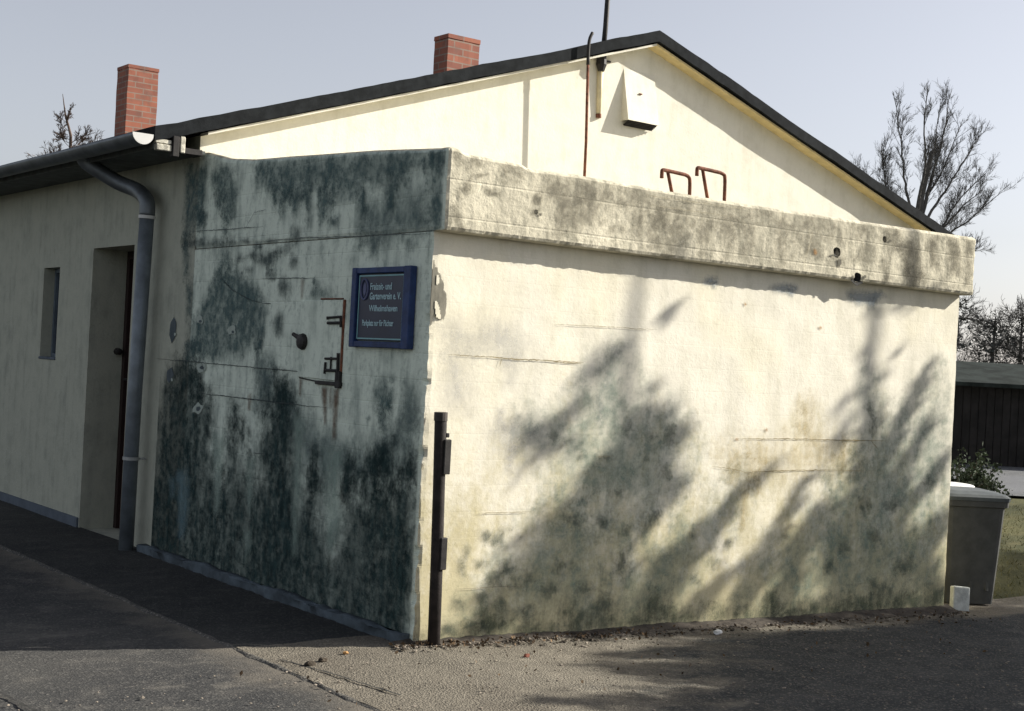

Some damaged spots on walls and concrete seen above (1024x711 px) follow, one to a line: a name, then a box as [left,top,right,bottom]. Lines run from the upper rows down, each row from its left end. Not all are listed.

water stain [184,163,282,276]
water stain [256,150,442,253]
peeling [430,260,447,326]
water stain [889,233,938,280]
water stain [950,240,970,270]
water stain [260,370,414,496]